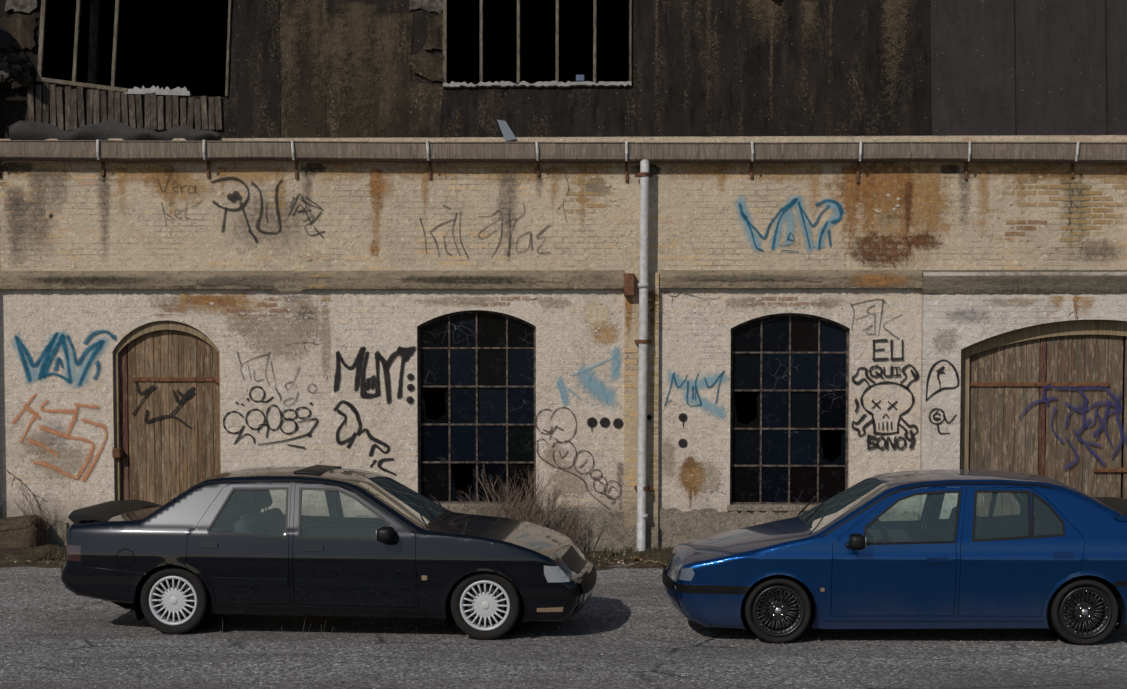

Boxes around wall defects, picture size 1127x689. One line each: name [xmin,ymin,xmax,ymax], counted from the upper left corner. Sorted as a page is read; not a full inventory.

leakage [0,163,66,250]
corrosion [108,162,284,214]
corrosion [313,161,458,256]
corrosion [484,163,612,222]
corrosion [670,164,733,185]
corrosion [837,162,947,267]
corrosion [962,162,1127,226]
corrosion [681,457,704,504]